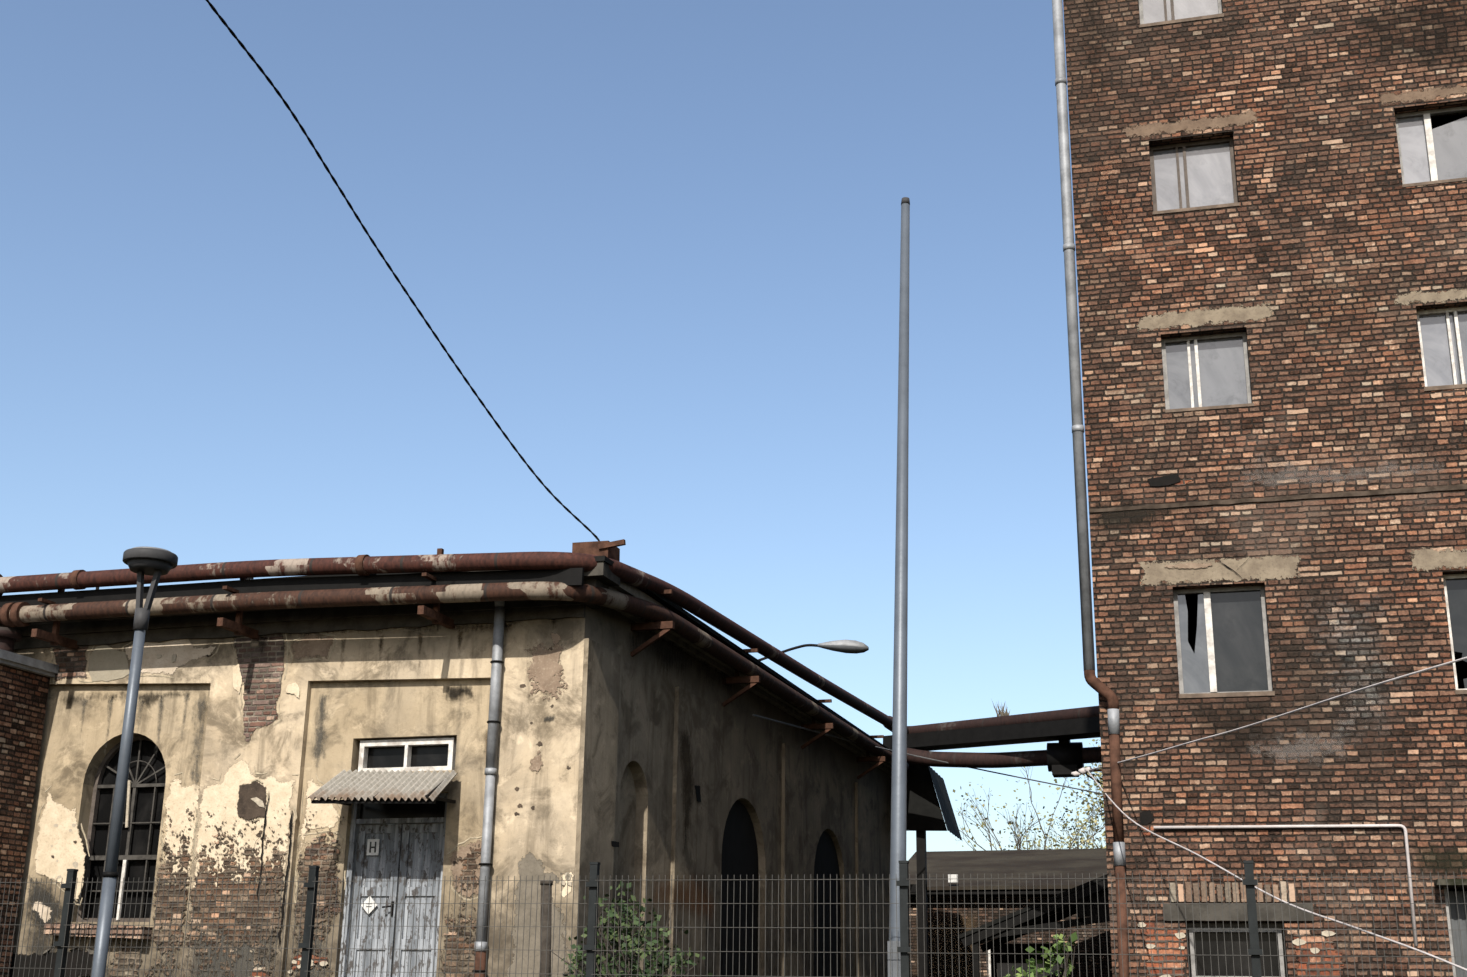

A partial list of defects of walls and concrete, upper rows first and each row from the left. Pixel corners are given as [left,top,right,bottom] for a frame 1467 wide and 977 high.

peeling [9,632,346,977]
spalling [439,836,482,977]